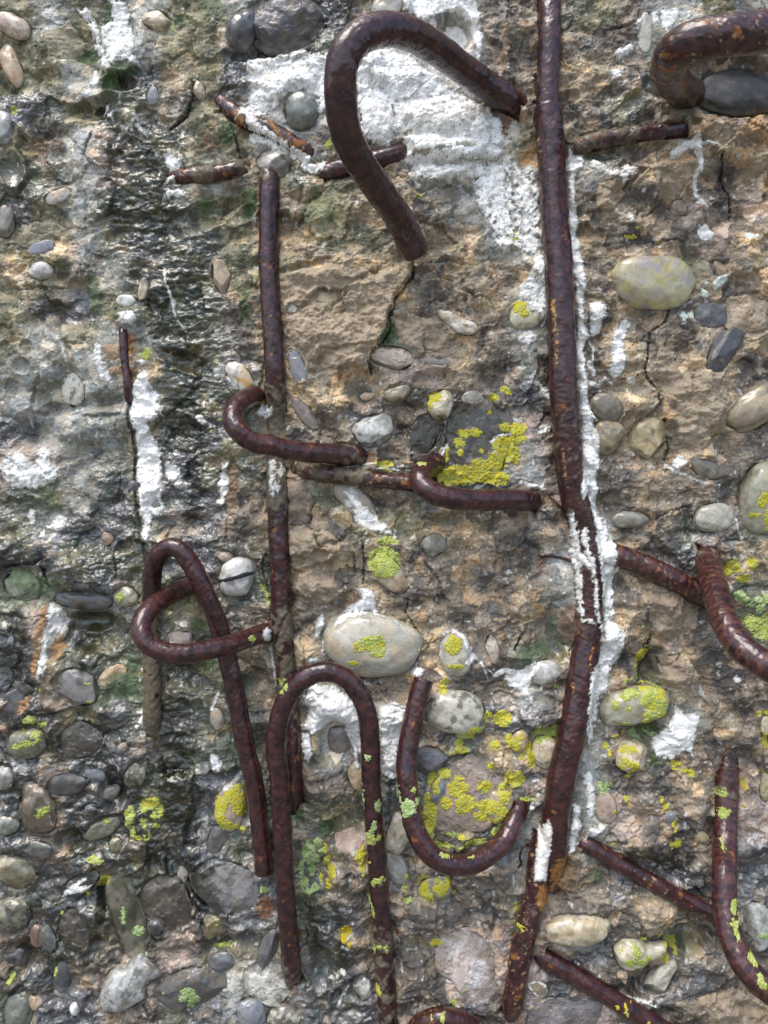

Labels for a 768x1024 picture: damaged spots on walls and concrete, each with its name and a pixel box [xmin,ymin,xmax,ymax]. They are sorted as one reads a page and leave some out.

damp [402,0,484,62]
damp [234,49,328,175]
rust [501,115,512,141]
damp [356,49,547,345]
damp [117,310,136,325]
crack [367,263,414,376]
damp [129,359,191,549]
rust [211,460,240,504]
damp [566,147,637,746]
rust [557,605,582,641]
damp [568,771,606,854]
rust [535,853,567,911]